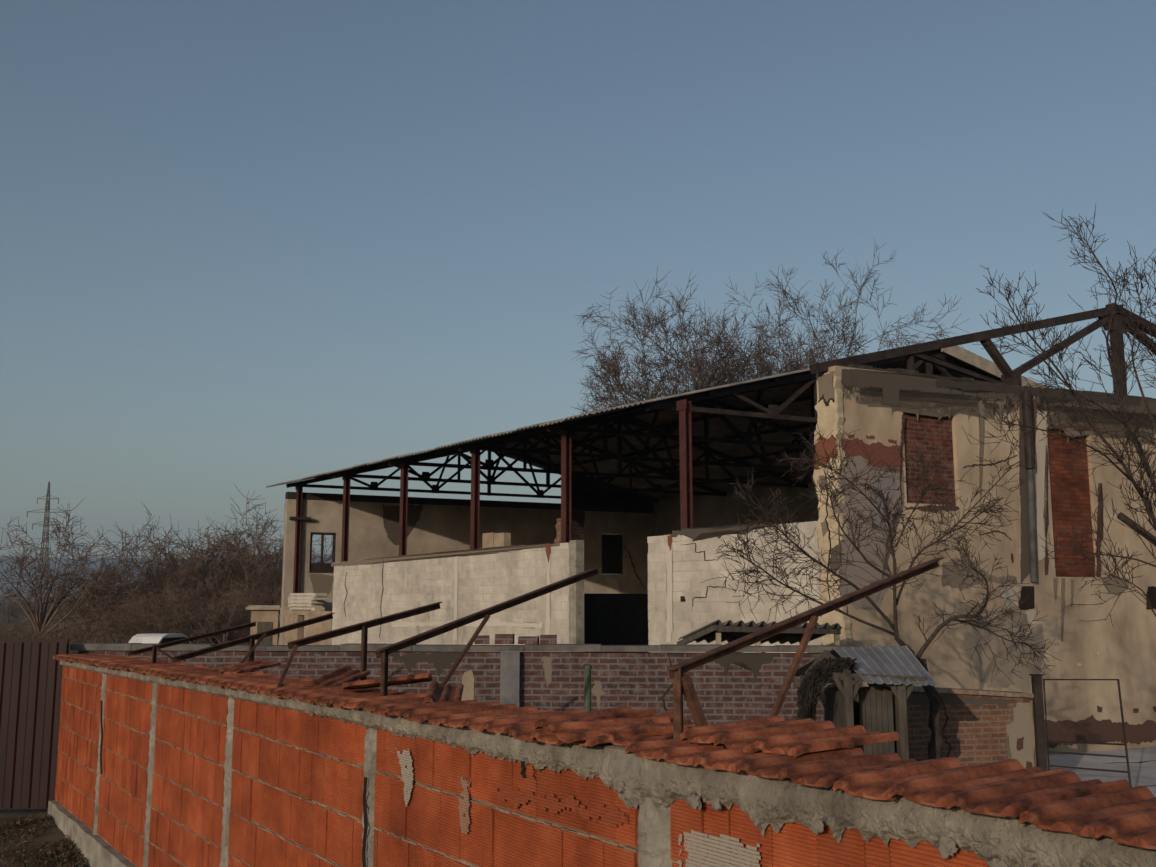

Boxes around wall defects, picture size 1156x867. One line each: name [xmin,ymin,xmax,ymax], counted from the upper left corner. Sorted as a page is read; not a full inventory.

crack [682,543,726,607]
spalling [814,415,959,612]